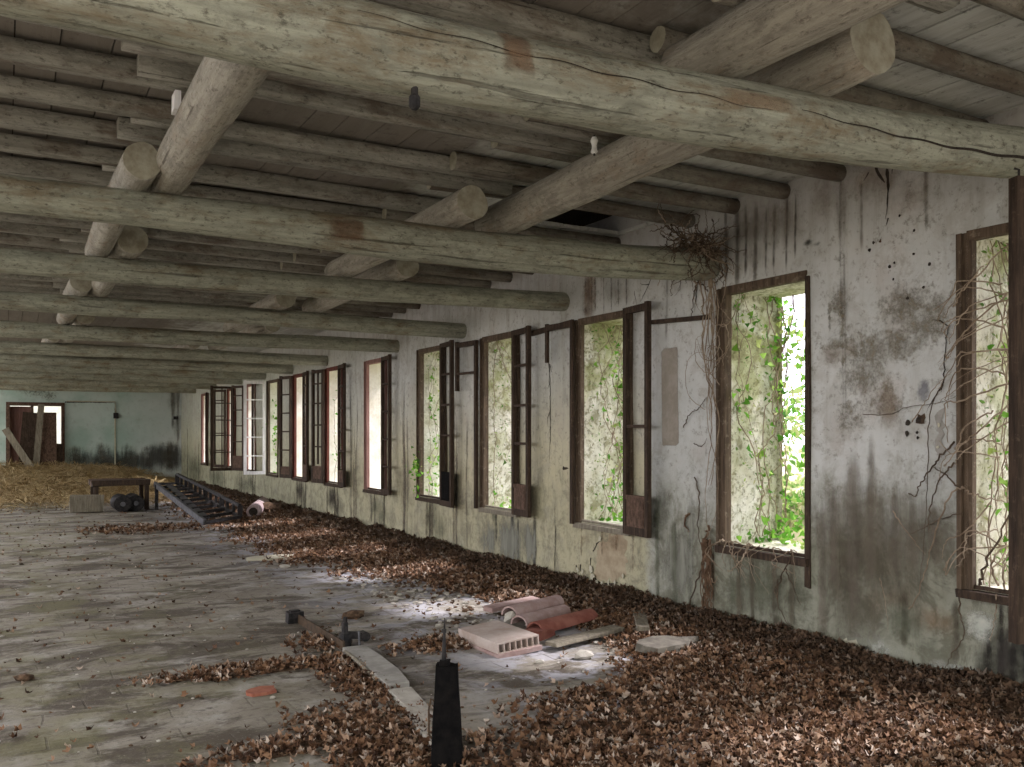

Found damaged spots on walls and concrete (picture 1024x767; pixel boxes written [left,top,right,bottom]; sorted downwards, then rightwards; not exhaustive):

crack [802,109,1024,159]
damp [725,201,796,281]
damp [829,289,955,409]
damp [69,433,197,474]
damp [830,494,951,643]